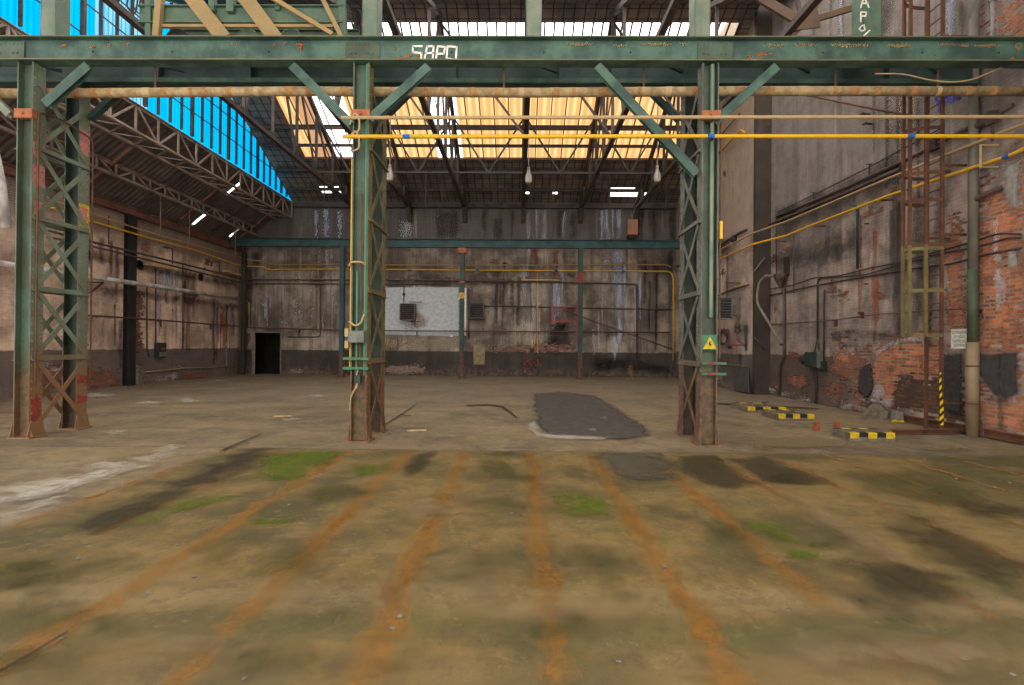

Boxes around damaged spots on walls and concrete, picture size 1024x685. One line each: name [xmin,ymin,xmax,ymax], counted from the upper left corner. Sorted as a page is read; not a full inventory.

peeling [748,44,814,59]
peeling [934,0,1024,59]
water stain [600,209,622,237]
water stain [613,253,641,358]
peeling [823,140,1024,434]